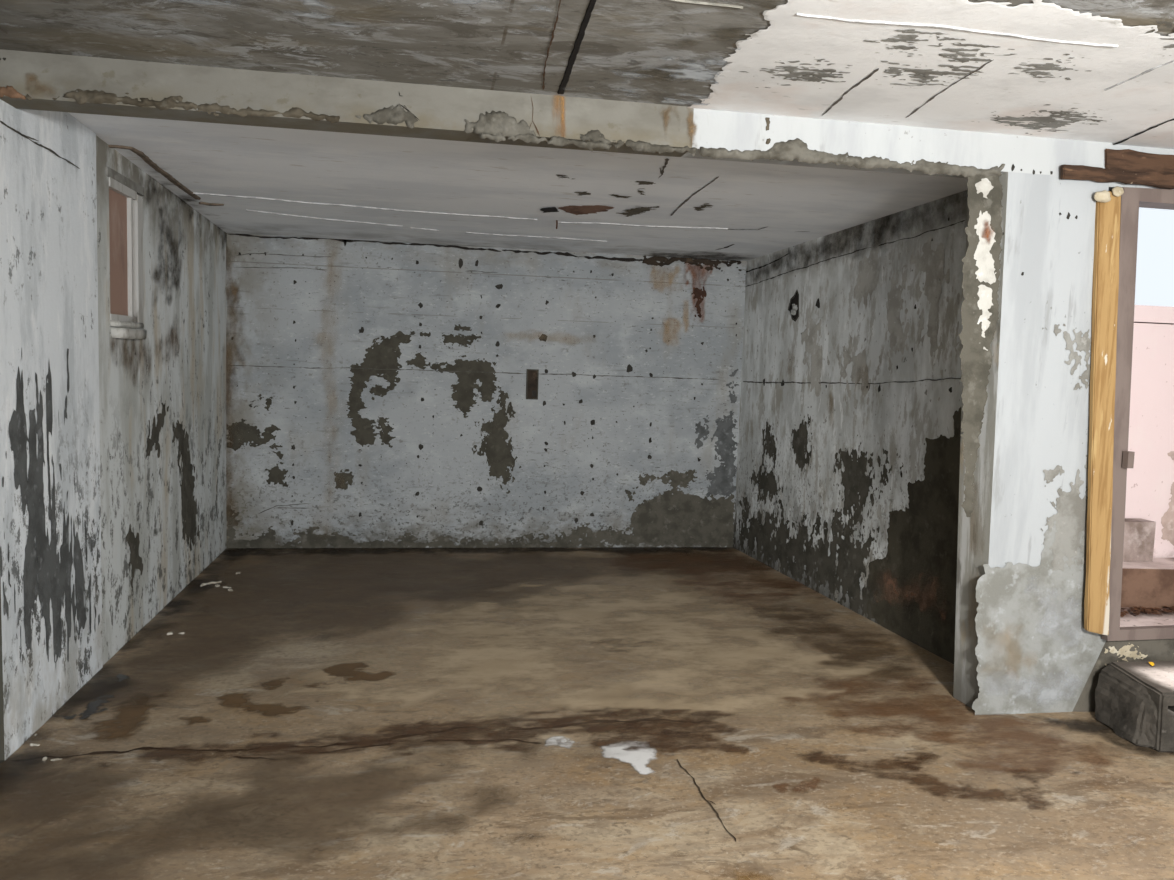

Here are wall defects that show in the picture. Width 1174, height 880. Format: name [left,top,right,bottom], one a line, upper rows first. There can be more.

peeling [738,59,853,89]
peeling [864,29,1092,86]
peeling [991,104,1112,135]
leakage [155,209,181,288]
corrosion [686,265,708,318]
peeling [226,110,1053,664]
peeling [146,400,201,564]
peeling [126,524,148,592]
peeling [972,443,1148,715]
leakage [52,547,911,739]
crack [12,716,712,761]
leakage [133,757,424,852]